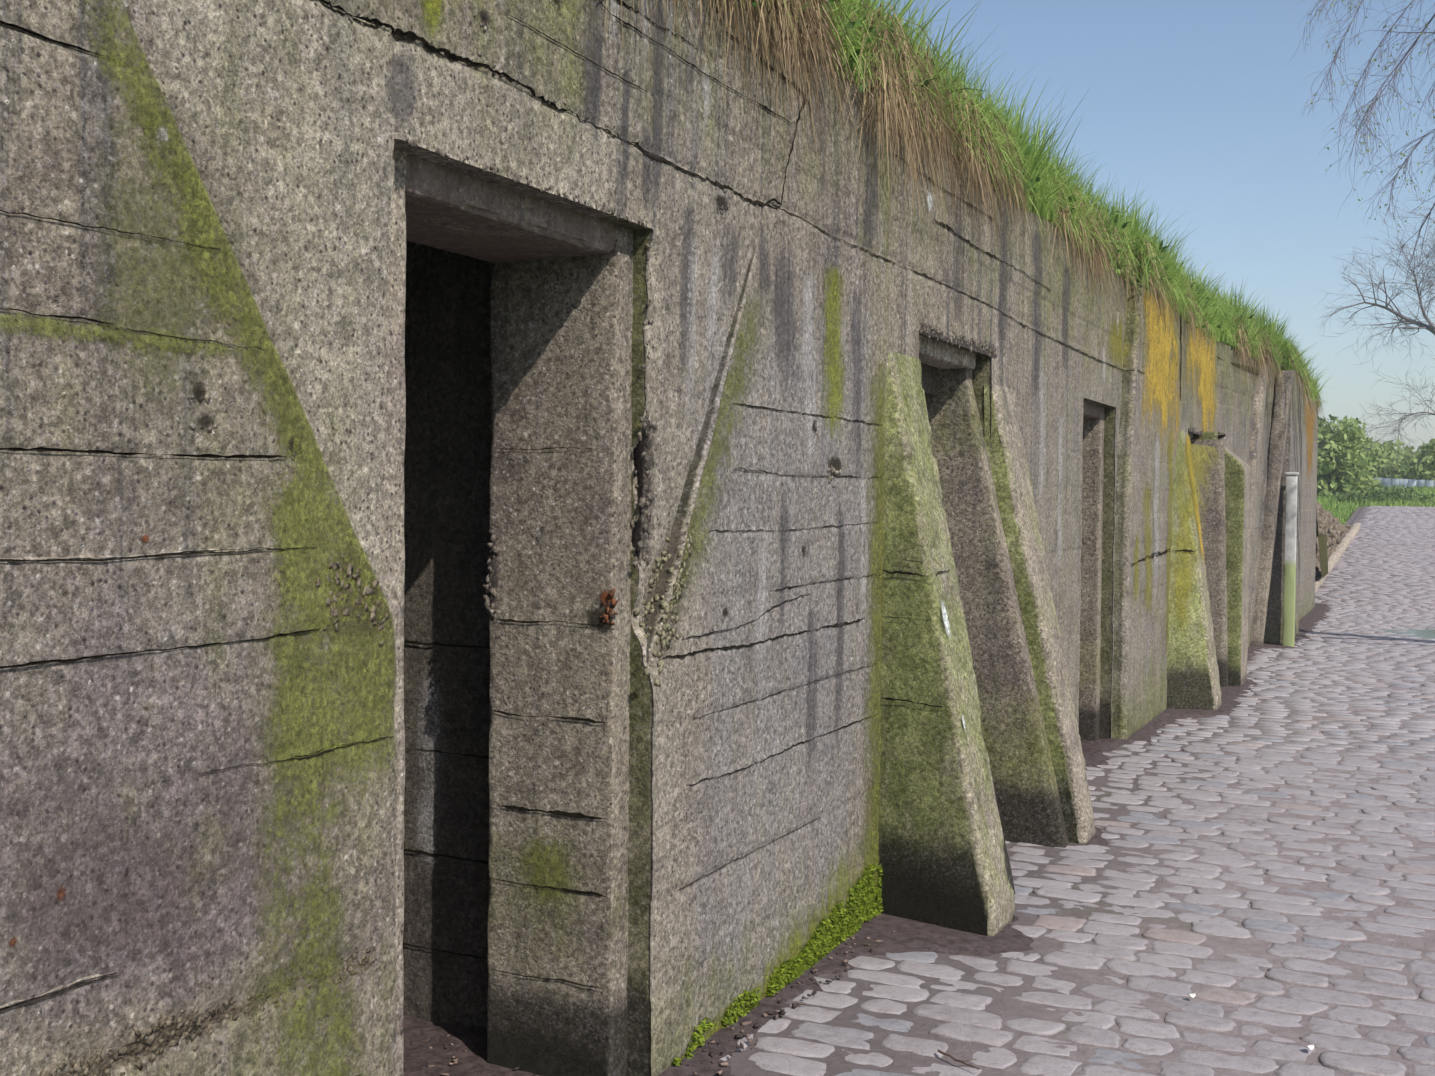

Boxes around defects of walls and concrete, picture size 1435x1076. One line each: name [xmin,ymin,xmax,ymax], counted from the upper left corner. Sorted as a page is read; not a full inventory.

crack [0,20,141,70]
crack [320,0,1145,374]
water stain [824,270,843,430]
crack [1177,314,1185,401]
crack [0,447,287,459]
crack [0,628,320,669]
rust [588,588,618,632]
crack [694,664,874,719]
crack [659,558,950,660]
crack [690,697,950,785]